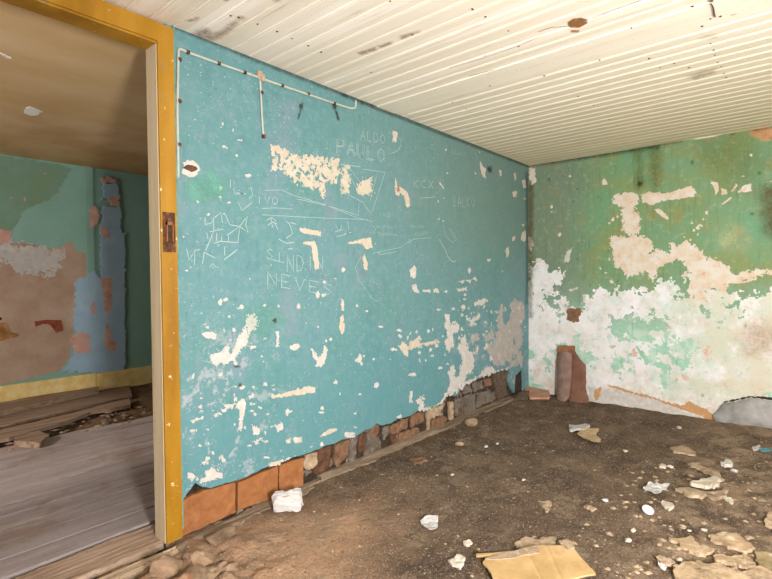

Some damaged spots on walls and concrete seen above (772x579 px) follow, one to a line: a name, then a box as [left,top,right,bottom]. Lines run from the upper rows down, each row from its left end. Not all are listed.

rust [568,18,587,33]
peeling [750,127,772,142]
peeling [269,144,373,199]
peeling [394,178,410,207]
peeling [711,175,752,205]
peeling [0,229,92,385]
peeling [89,277,114,314]
peeling [183,186,772,536]